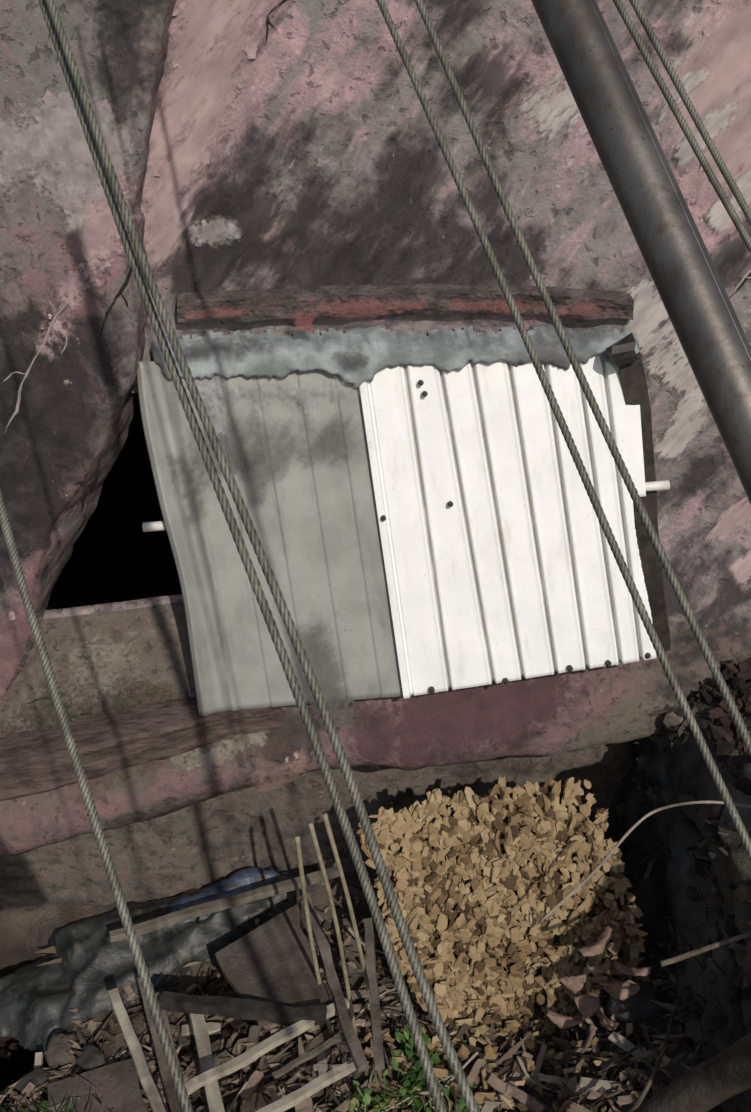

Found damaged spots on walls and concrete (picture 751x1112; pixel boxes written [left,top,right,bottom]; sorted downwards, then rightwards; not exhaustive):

crack [266,0,286,41]
water stain [190,219,240,246]
crack [100,267,132,336]
crack [1,255,96,433]